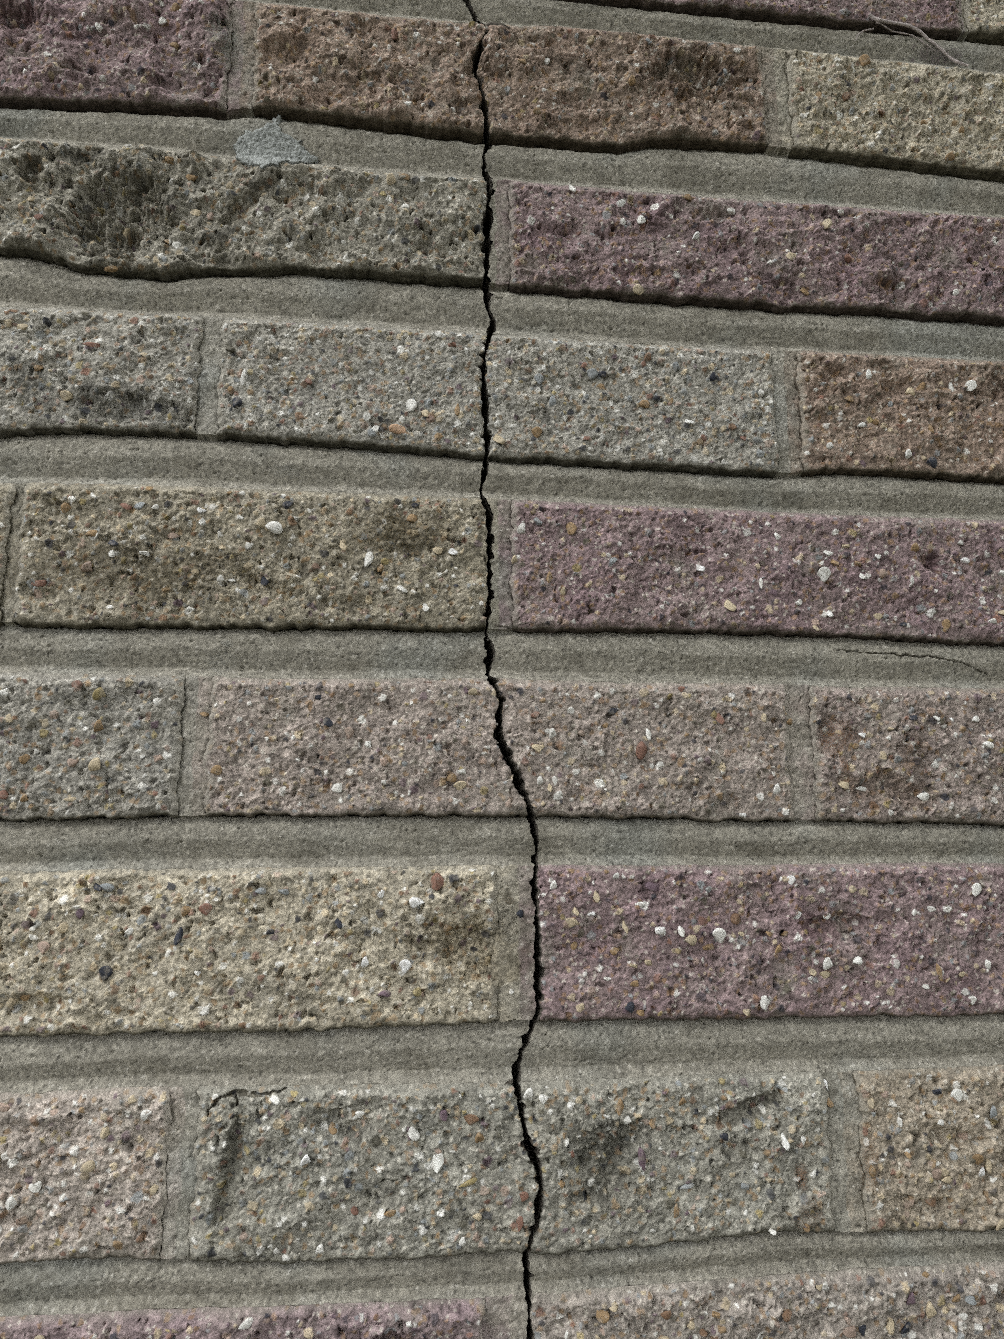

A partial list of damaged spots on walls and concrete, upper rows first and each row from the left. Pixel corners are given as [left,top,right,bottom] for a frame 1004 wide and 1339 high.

crack [463,0,545,1339]